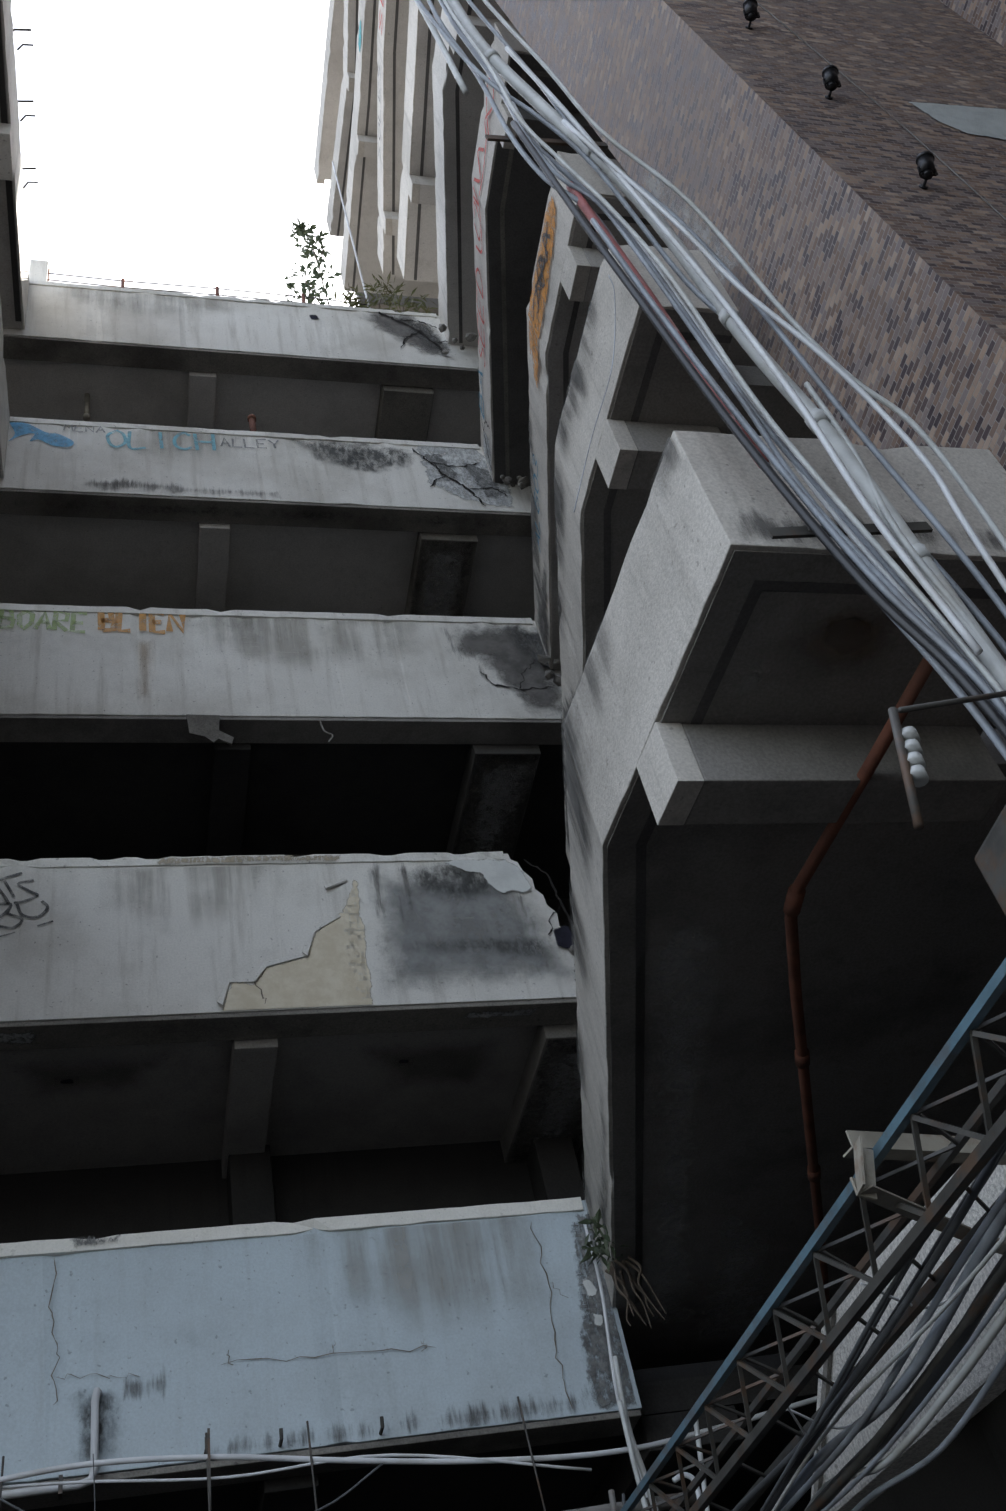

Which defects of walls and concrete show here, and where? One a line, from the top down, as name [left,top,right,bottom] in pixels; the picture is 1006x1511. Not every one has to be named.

spalling [417,432,530,507]
water stain [373,755,583,976]
peeling [446,860,531,893]
crack [48,1260,140,1404]
crack [221,1340,436,1365]
crack [530,1222,573,1409]
spalling [573,1214,636,1408]
water stain [82,1396,110,1458]
water stain [469,1402,536,1427]